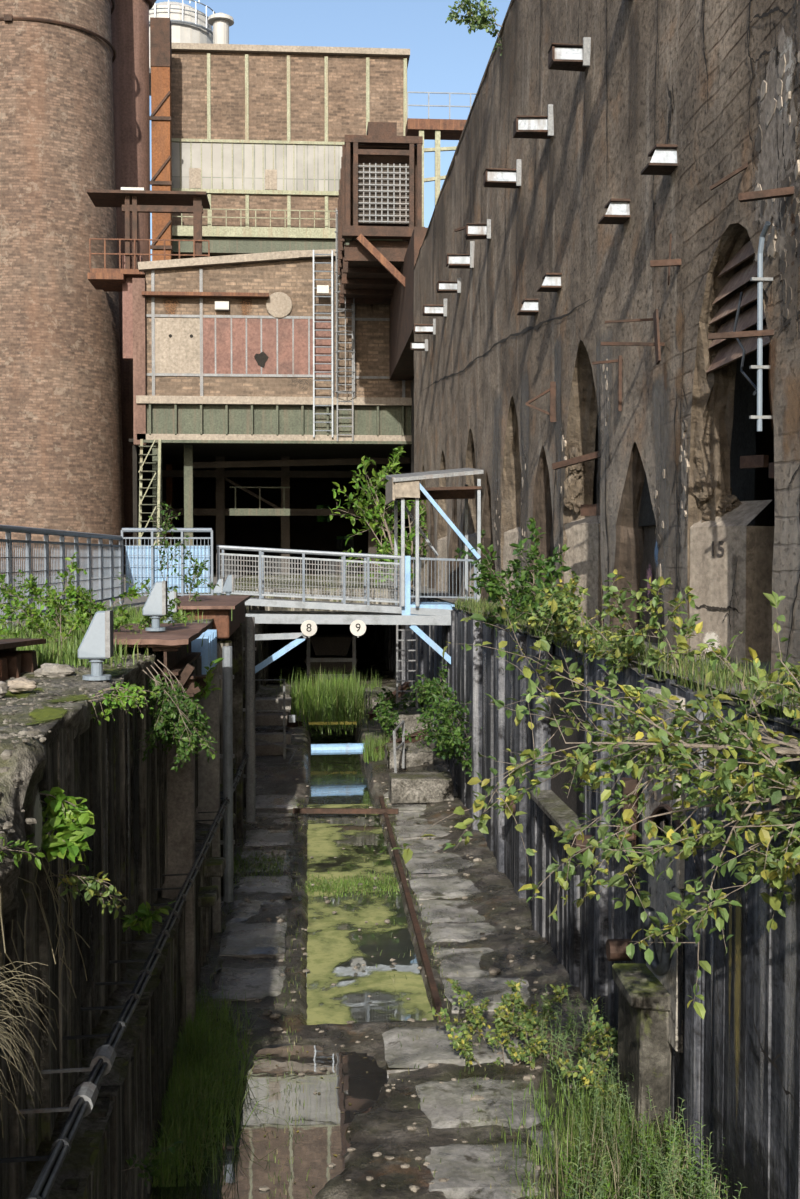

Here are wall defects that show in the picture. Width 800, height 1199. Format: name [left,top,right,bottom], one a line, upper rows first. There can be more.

crack [535,0,543,108]
crack [700,0,708,110]
spalling [747,0,800,341]
crack [478,135,537,318]
crack [421,299,590,391]
crack [789,465,800,524]
crack [785,573,800,676]